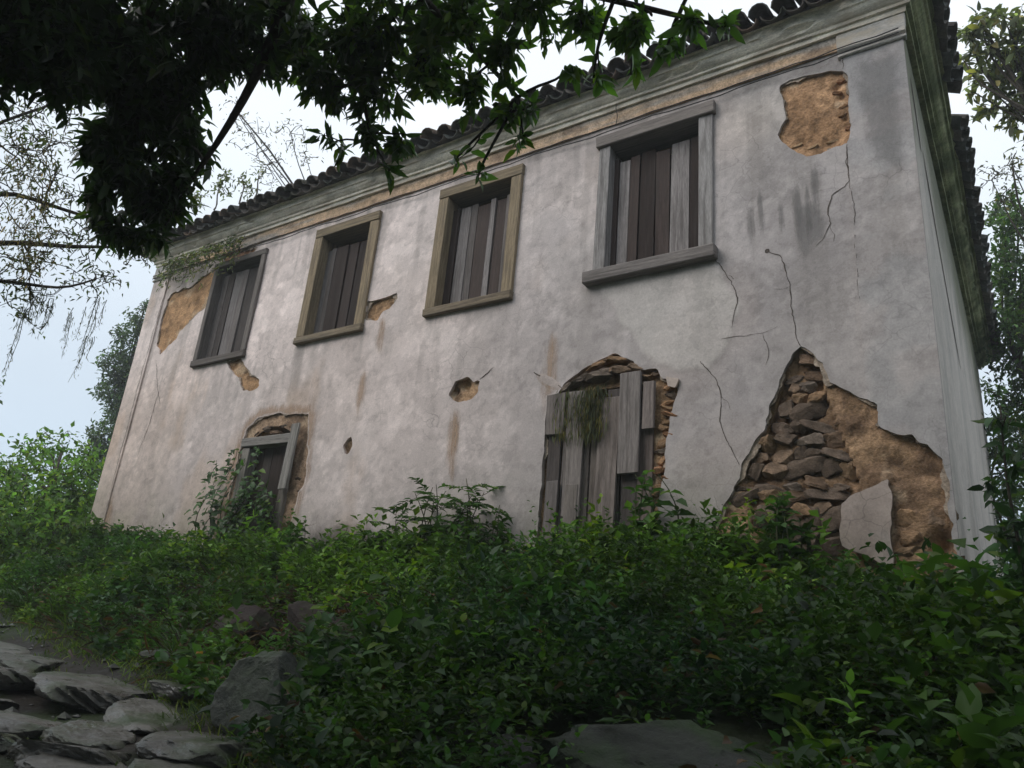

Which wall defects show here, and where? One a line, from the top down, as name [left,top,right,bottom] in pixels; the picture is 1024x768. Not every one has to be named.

spalling [779,73,851,156]
crack [816,146,860,298]
spalling [157,269,214,354]
spalling [366,294,398,321]
crack [715,252,800,363]
spalling [227,359,259,391]
spalling [217,413,308,545]
spalling [451,378,479,402]
spalling [540,435,549,538]
spalling [559,354,679,520]
crack [700,361,739,464]
spalling [711,347,965,586]